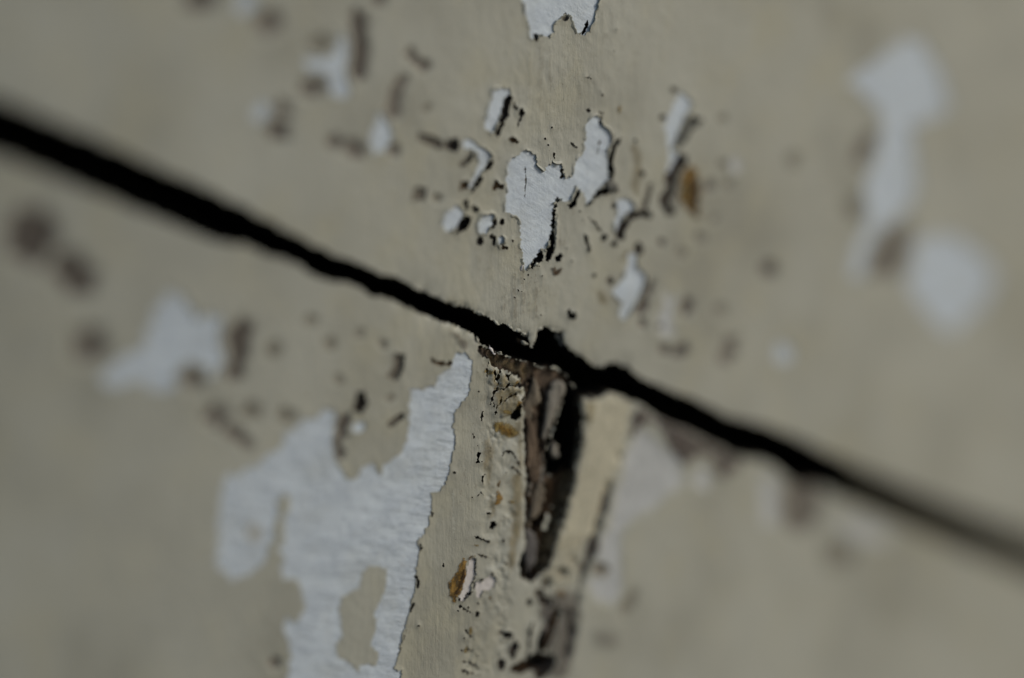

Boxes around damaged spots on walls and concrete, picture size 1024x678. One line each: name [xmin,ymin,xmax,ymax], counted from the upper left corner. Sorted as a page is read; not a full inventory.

peeling [521,0,602,42]
peeling [434,85,703,363]
crack [0,98,1024,574]
hole [510,405,522,421]
peeling [215,351,480,678]
peeling [457,557,496,617]
spalling [526,567,568,608]
hole [497,630,520,671]